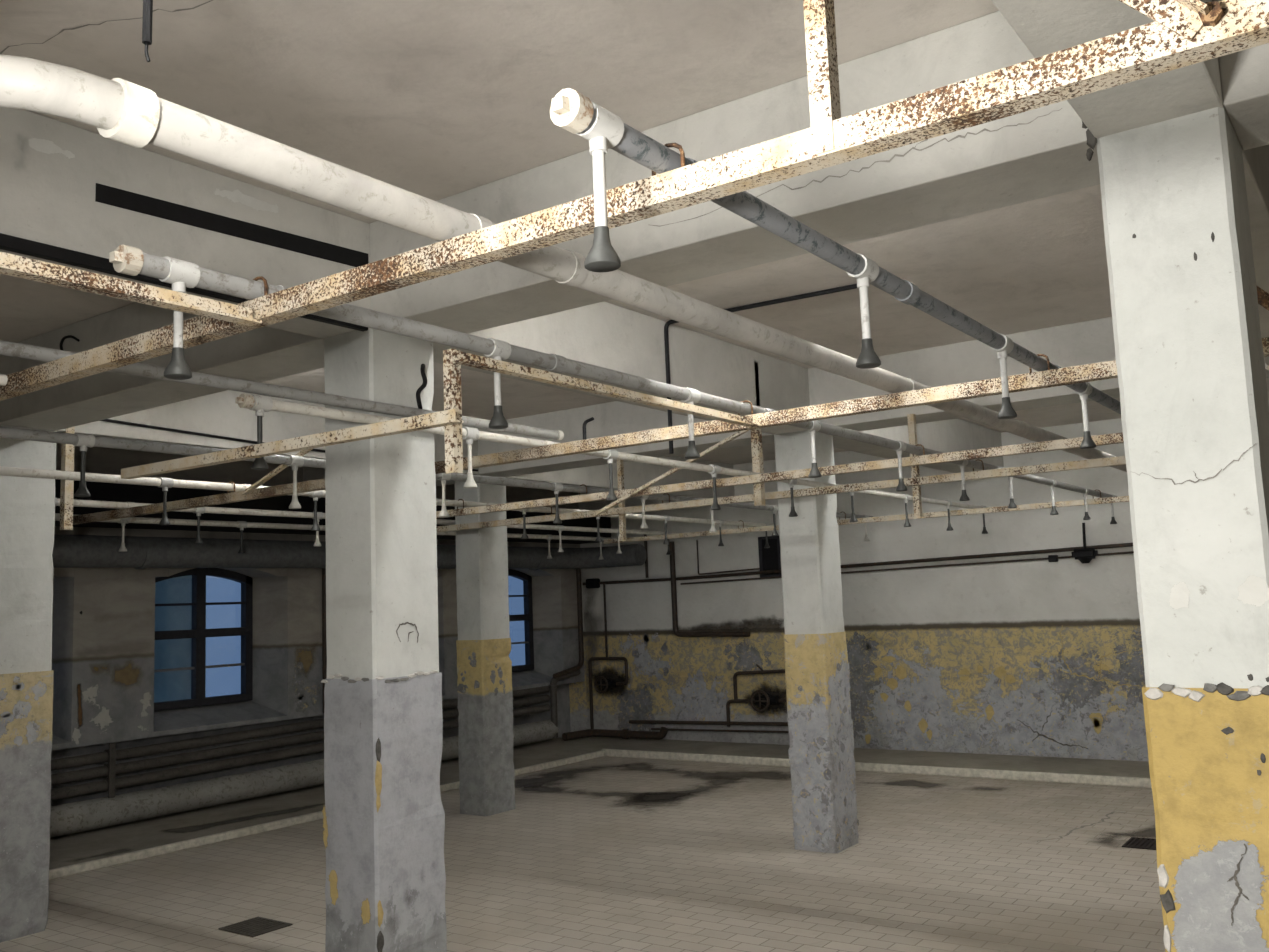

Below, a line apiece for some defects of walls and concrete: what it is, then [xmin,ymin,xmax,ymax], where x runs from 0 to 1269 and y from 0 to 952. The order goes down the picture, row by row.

crack [0,0,213,54]
crack [1134,443,1256,485]
peeling [0,676,47,746]
peeling [72,684,113,746]
peeling [457,652,506,696]
peeling [616,633,773,740]
peeling [787,630,1269,853]
peeling [1157,839,1269,952]
crack [1227,844,1249,926]